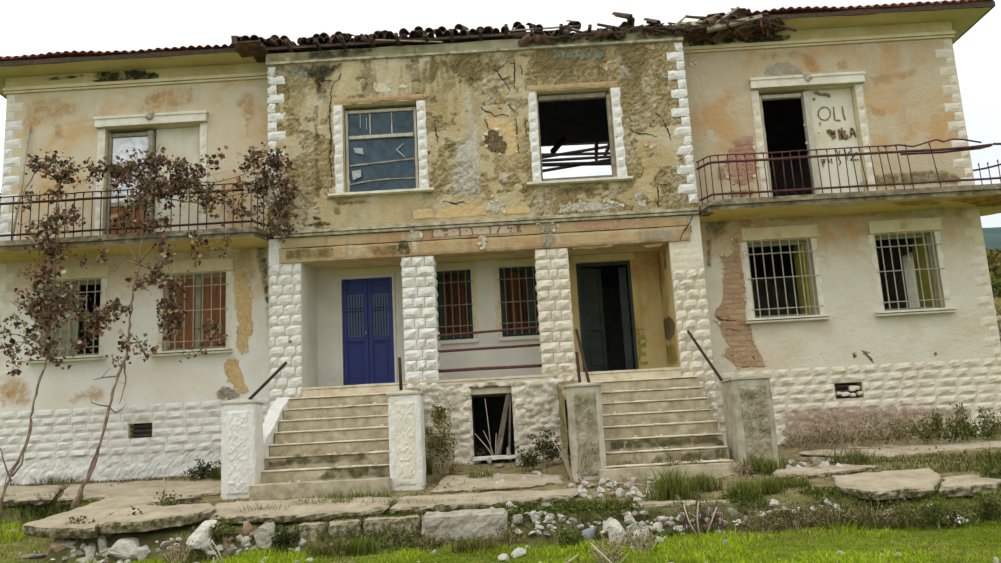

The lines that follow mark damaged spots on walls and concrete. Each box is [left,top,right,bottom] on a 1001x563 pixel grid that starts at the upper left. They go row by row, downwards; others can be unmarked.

peeling [373,82,408,93]
peeling [481,117,518,156]
flaking render [717,136,759,185]
peeling [410,191,530,239]
spalling [536,199,624,247]
flaking render [714,219,766,369]
peeling [215,267,253,401]
spalling [663,316,675,340]